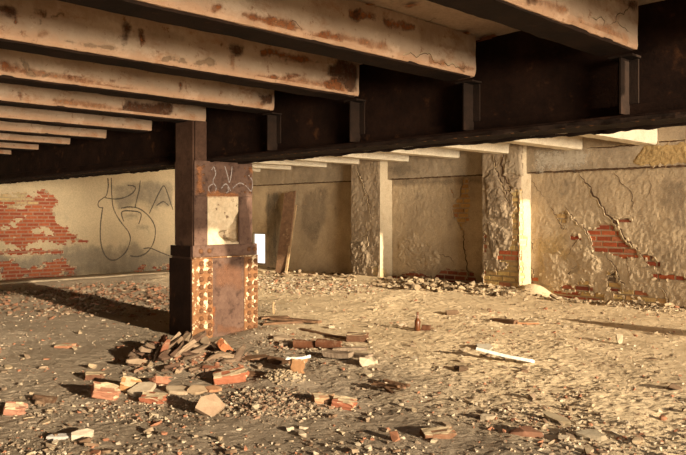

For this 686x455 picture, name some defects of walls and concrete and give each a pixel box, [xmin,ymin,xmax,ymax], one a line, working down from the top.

rust [0,6,17,24]
rust [122,22,145,44]
rust [243,13,297,31]
rust [316,31,348,40]
rust [349,3,415,31]
rust [259,59,357,92]
peeling [628,138,686,168]
spalling [0,189,88,280]
peeling [392,144,539,288]
crack [531,172,651,292]
spalling [571,216,686,283]
spalling [546,268,669,304]